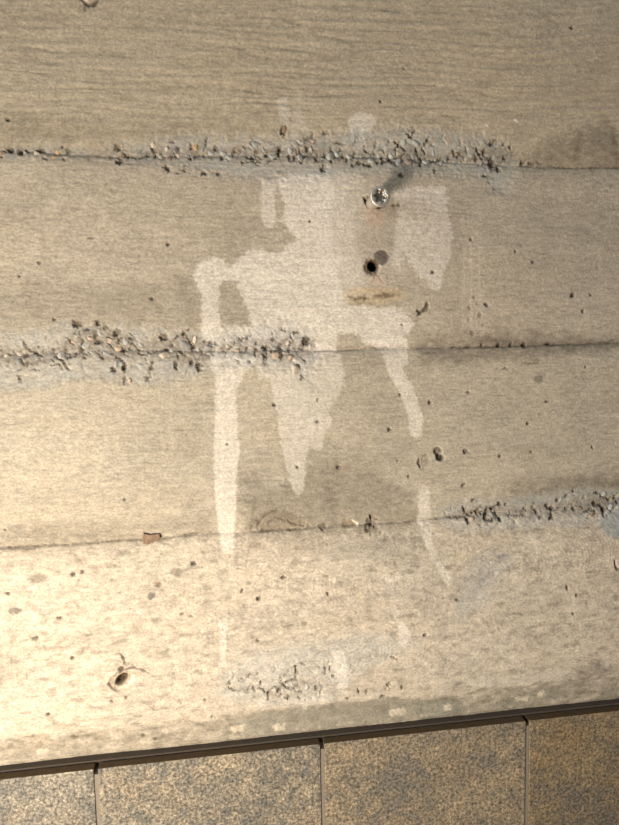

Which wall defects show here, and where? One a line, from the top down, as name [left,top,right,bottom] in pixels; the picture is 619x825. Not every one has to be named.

leakage [258,180,279,230]
leakage [306,174,412,305]
leakage [0,343,455,626]